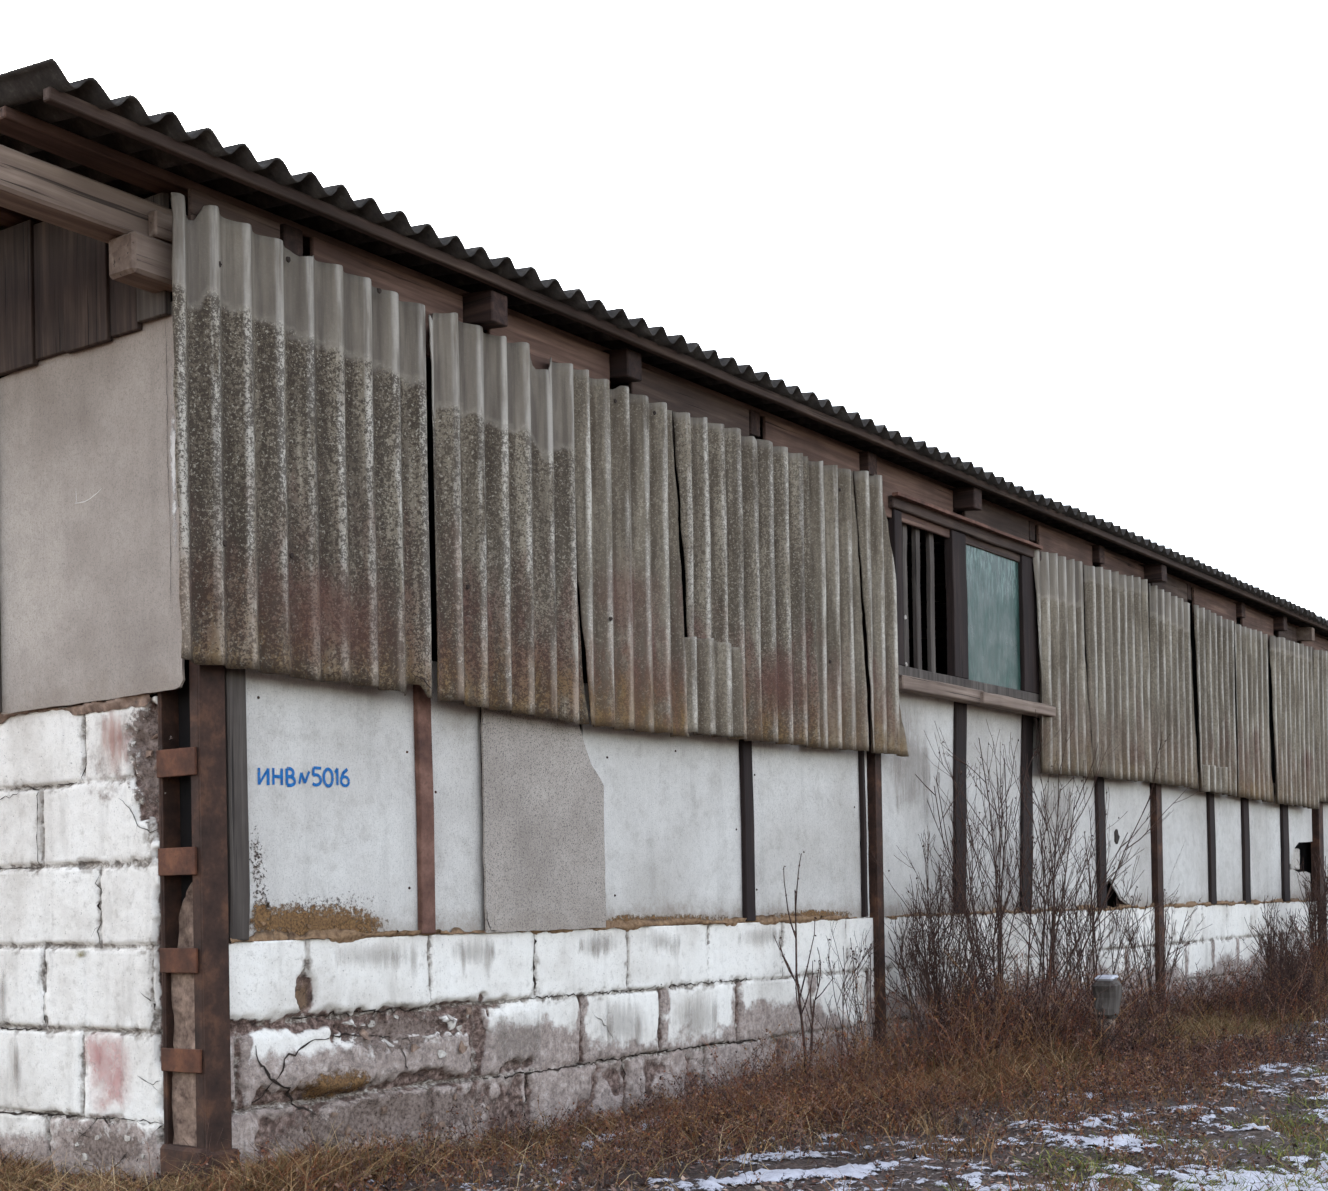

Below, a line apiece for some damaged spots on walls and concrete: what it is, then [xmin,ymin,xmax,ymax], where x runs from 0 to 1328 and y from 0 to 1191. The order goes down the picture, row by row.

spalling [122,701,172,823]
crack [251,1007,419,1115]
spalling [332,1007,473,1058]
peeling [61,1116,145,1172]
spalling [261,1088,499,1151]